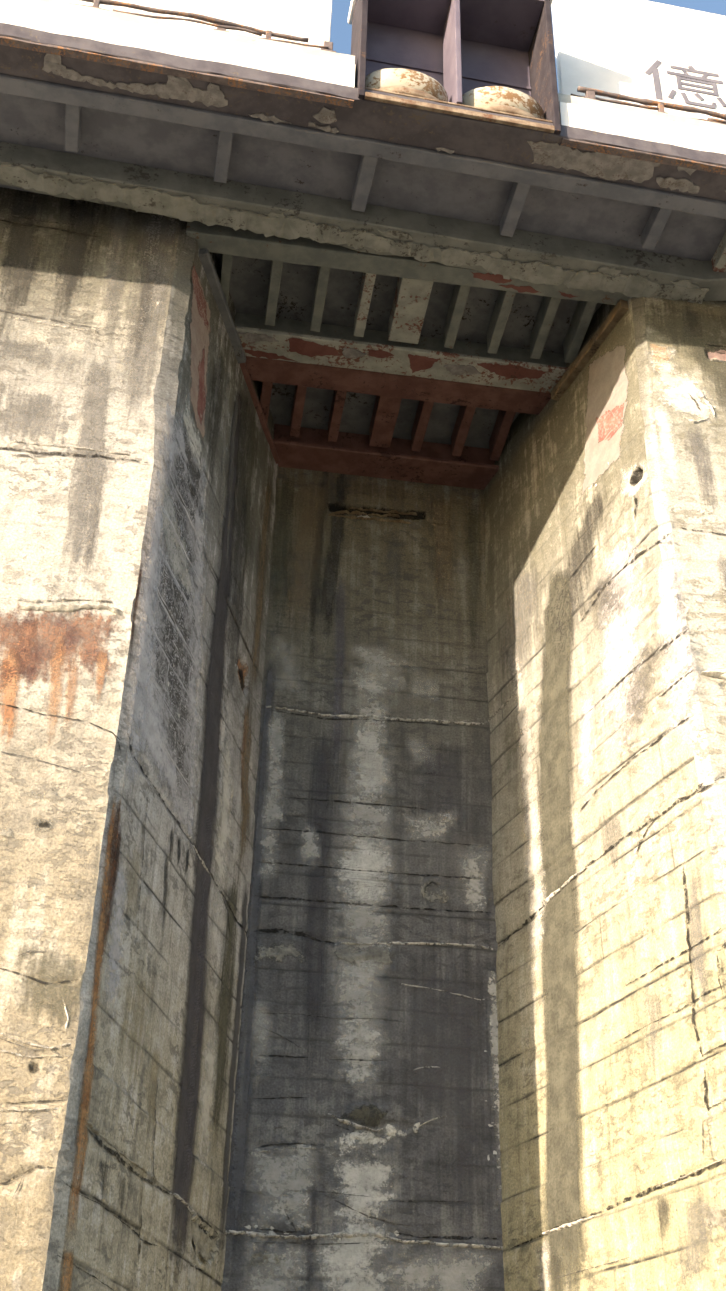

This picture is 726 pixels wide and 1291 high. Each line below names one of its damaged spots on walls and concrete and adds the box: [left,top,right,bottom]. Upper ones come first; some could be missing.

peeling [42,53,228,107]
peeling [527,141,700,194]
water stain [56,199,98,314]
water stain [107,209,180,412]
peeling [238,332,546,379]
spalling [706,344,726,362]
water stain [0,361,108,564]
spalling [328,503,426,524]
rust [0,604,118,737]
water stain [657,565,692,727]
water stain [163,362,644,1291]
rust [69,802,121,1226]